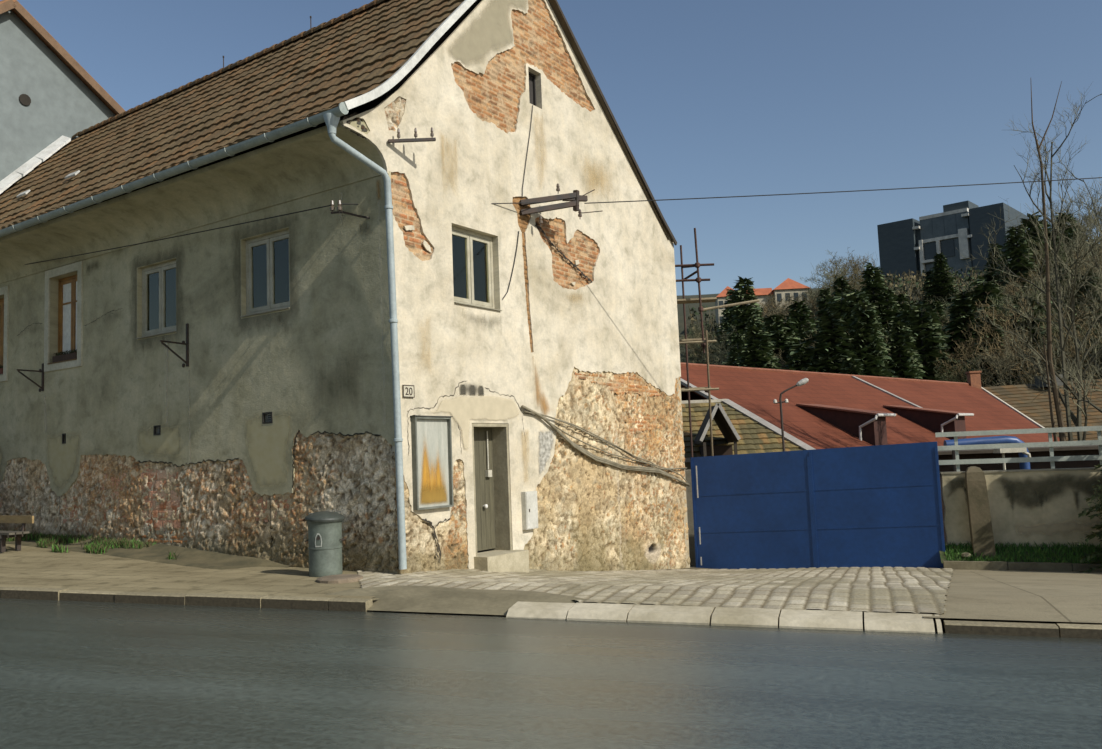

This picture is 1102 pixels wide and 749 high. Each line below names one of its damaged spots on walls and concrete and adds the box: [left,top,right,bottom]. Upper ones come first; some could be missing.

spalling [451,0,594,133]
spalling [391,172,433,261]
spalling [535,217,599,290]
spalling [0,431,468,574]
spalling [524,368,690,571]
damp [1001,476,1102,507]